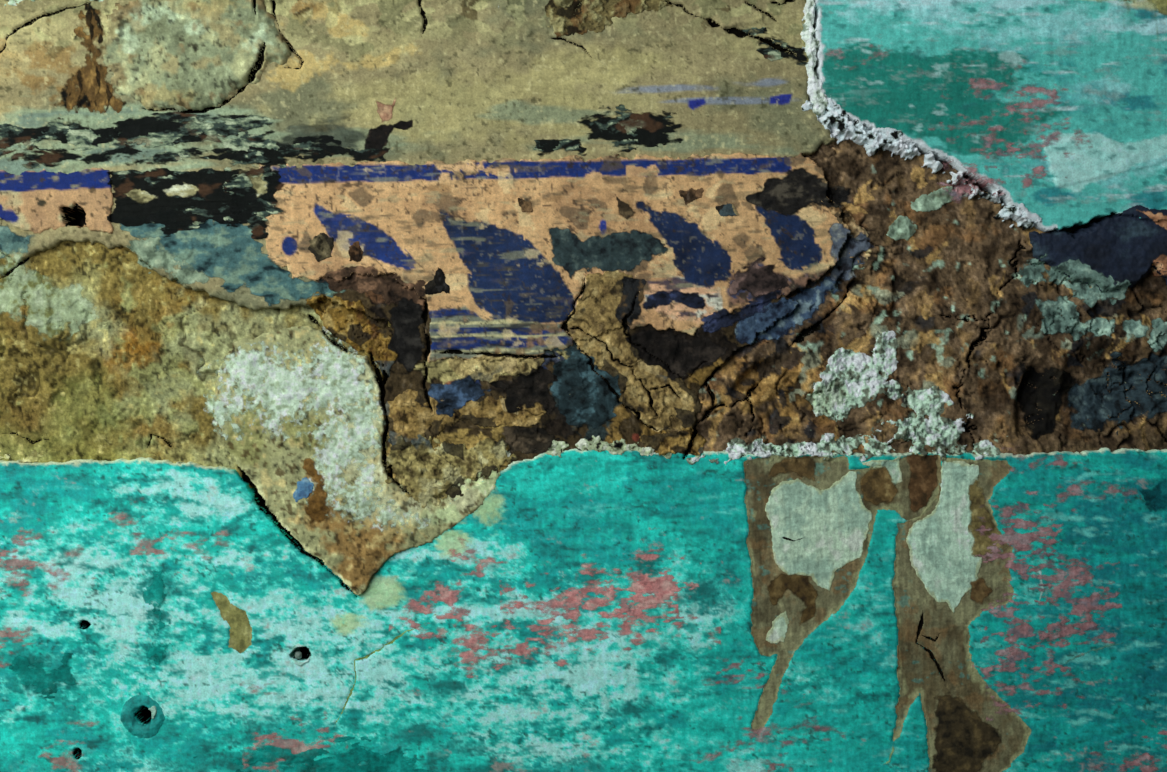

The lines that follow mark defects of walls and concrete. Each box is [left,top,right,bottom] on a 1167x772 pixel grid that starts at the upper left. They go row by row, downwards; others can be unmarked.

crack [0,2,91,53]
crack [143,0,304,113]
crack [418,0,428,37]
crack [665,0,796,55]
peeling [286,100,413,165]
peeling [533,104,683,156]
peeling [126,184,199,203]
peeling [549,227,668,279]
crack [422,278,762,459]
crack [941,240,1026,448]
peeling [389,548,698,678]
peeling [892,457,1122,772]